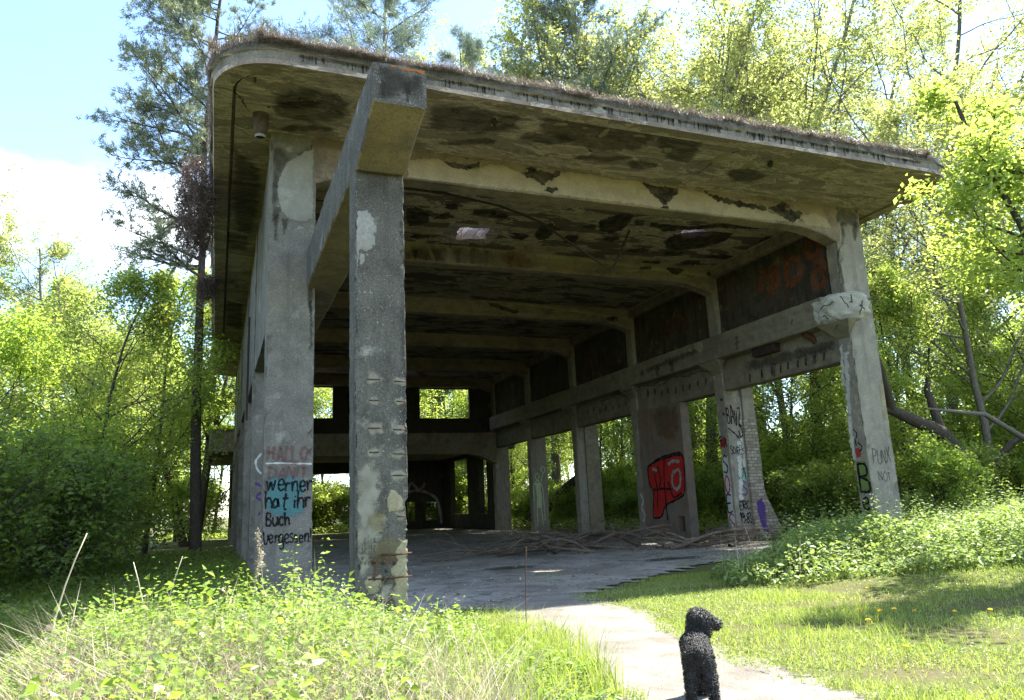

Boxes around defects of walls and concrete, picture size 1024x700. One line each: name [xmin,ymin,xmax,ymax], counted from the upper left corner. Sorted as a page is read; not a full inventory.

flaking render [277,149,314,229]
flaking render [356,210,377,266]
flaking render [404,158,831,276]
spalling [358,449,412,607]